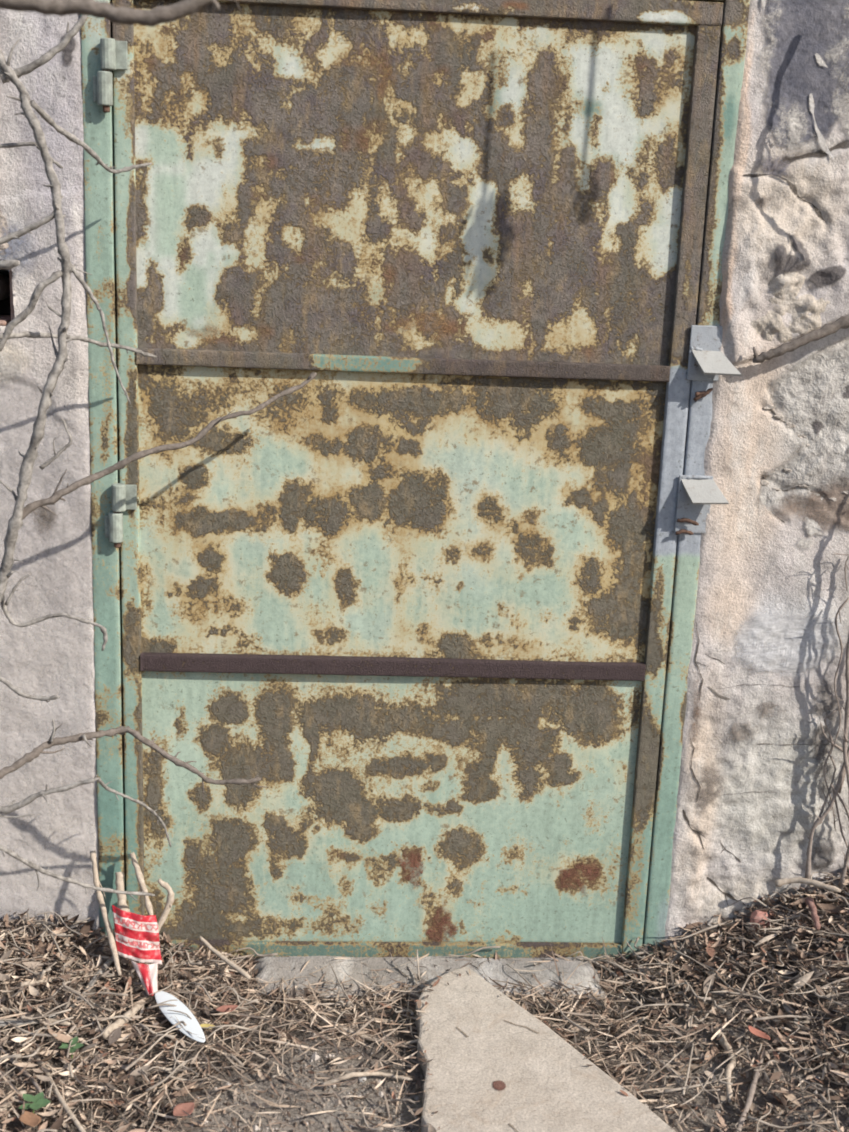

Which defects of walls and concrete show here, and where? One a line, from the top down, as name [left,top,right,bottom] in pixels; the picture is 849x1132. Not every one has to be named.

leakage [788,93,834,159]
crack [743,140,849,221]
crack [682,733,777,863]
rust [399,853,423,886]
rust [560,863,599,890]
crack [707,877,737,905]
rust [426,908,457,942]